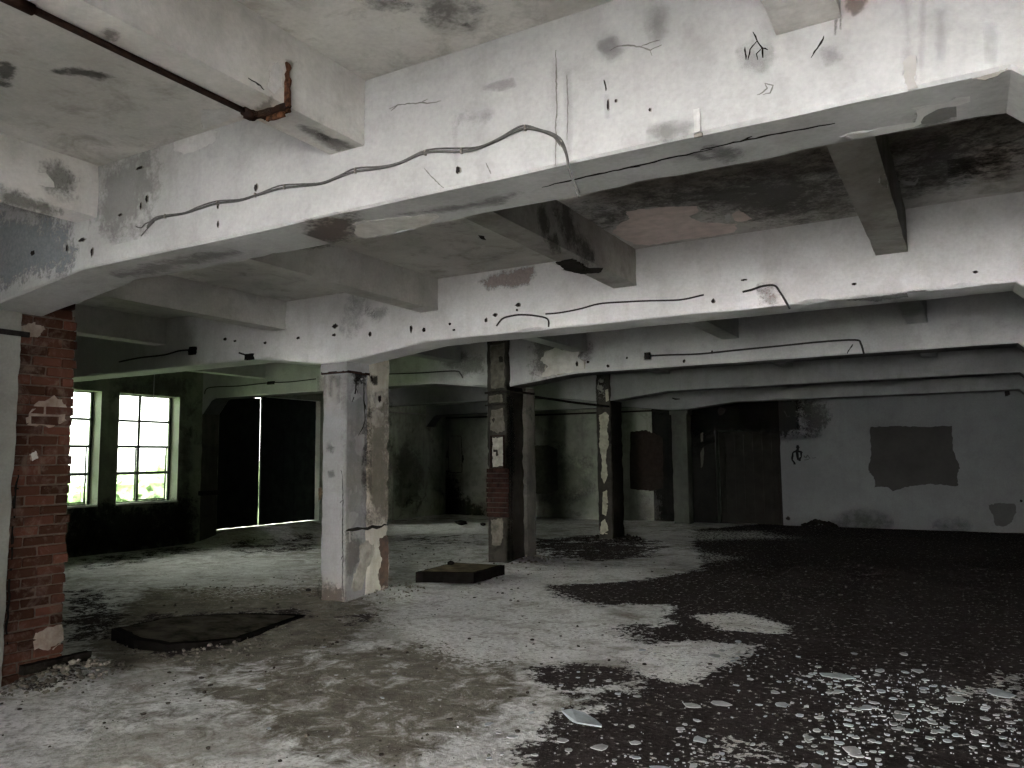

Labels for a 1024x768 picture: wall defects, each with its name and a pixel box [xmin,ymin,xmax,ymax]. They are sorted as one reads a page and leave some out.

crack [610,40,661,55]
crack [744,32,774,95]
crack [545,51,835,187]
leakage [921,106,957,127]
leakage [46,162,75,193]
leakage [3,190,61,215]
peeling [612,206,752,246]
spalling [554,258,603,274]
leakage [691,400,831,439]
flaking render [486,343,509,546]
peeling [599,389,609,534]
crack [340,471,388,597]